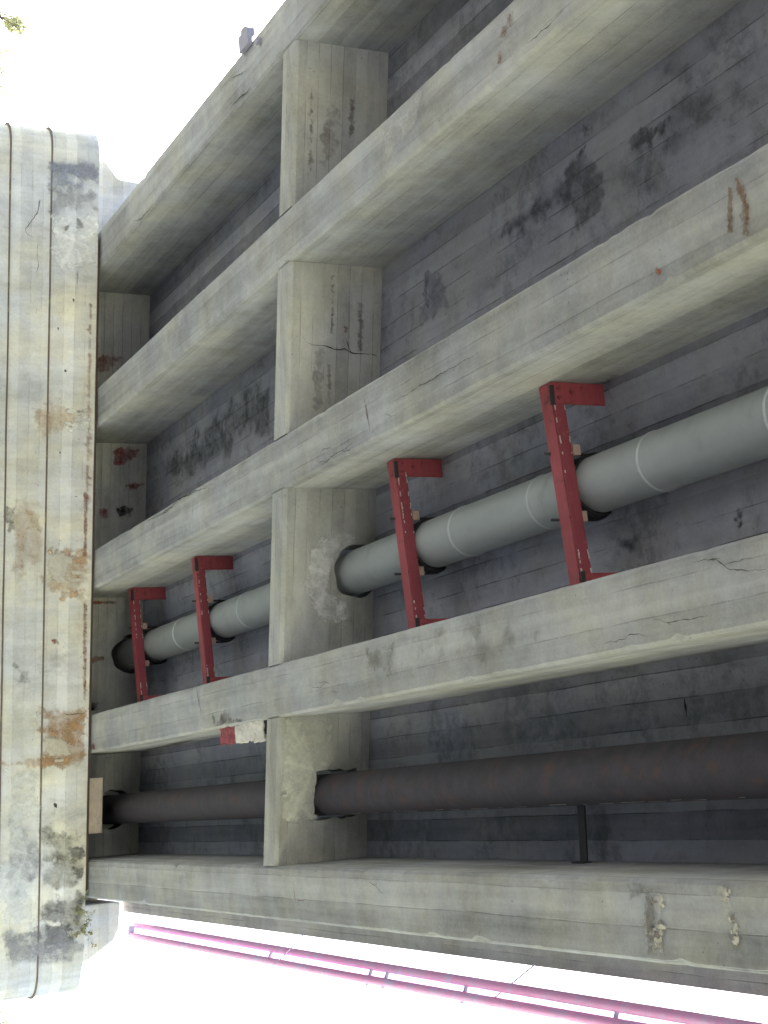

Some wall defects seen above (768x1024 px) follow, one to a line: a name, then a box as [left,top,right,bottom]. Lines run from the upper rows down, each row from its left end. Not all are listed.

damp [50,163,98,197]
rust [727,178,749,232]
damp [52,216,98,269]
crack [303,337,375,356]
crack [698,558,766,571]
rust [39,710,95,769]
spalling [213,714,267,745]
damp [5,835,85,961]